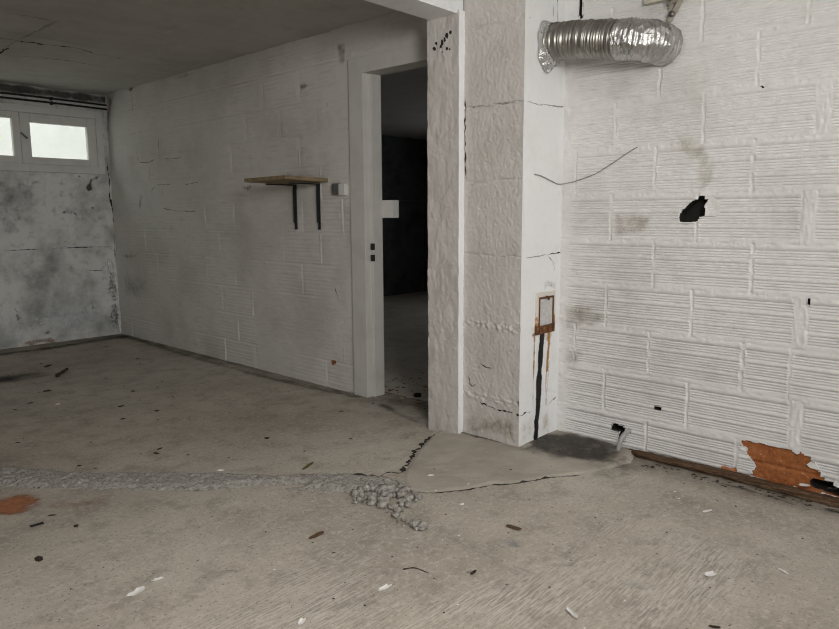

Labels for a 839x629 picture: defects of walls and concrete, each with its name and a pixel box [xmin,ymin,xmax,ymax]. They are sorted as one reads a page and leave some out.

crack [464,100,564,176]
spalling [678,195,721,223]
leakage [531,334,617,460]
crack [353,434,435,476]
crack [411,475,579,493]
peeling [740,440,839,497]